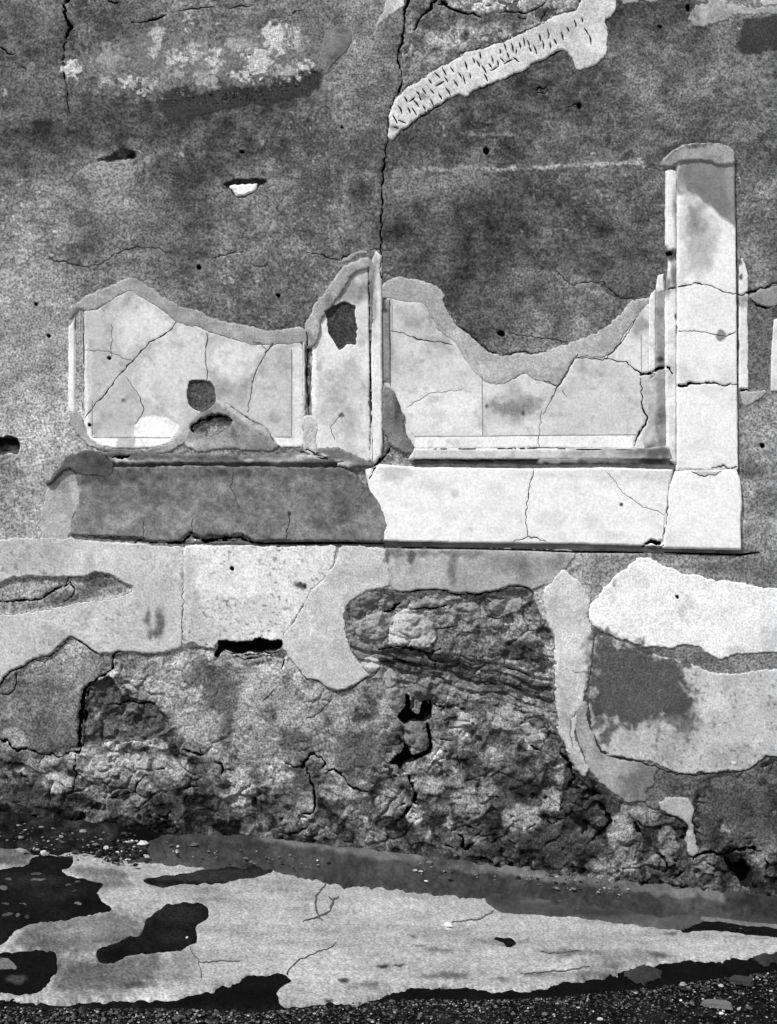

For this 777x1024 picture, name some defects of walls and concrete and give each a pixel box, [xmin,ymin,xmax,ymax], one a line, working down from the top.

crack [61,0,73,114]
water stain [60,19,321,129]
peeling [229,184,258,197]
crack [306,0,549,278]
crack [85,322,176,424]
crack [190,341,274,433]
spalling [324,301,358,350]
crack [392,266,749,547]
spalling [0,571,133,615]
spalling [82,676,169,745]
spalling [343,587,559,750]
water stain [586,627,695,746]